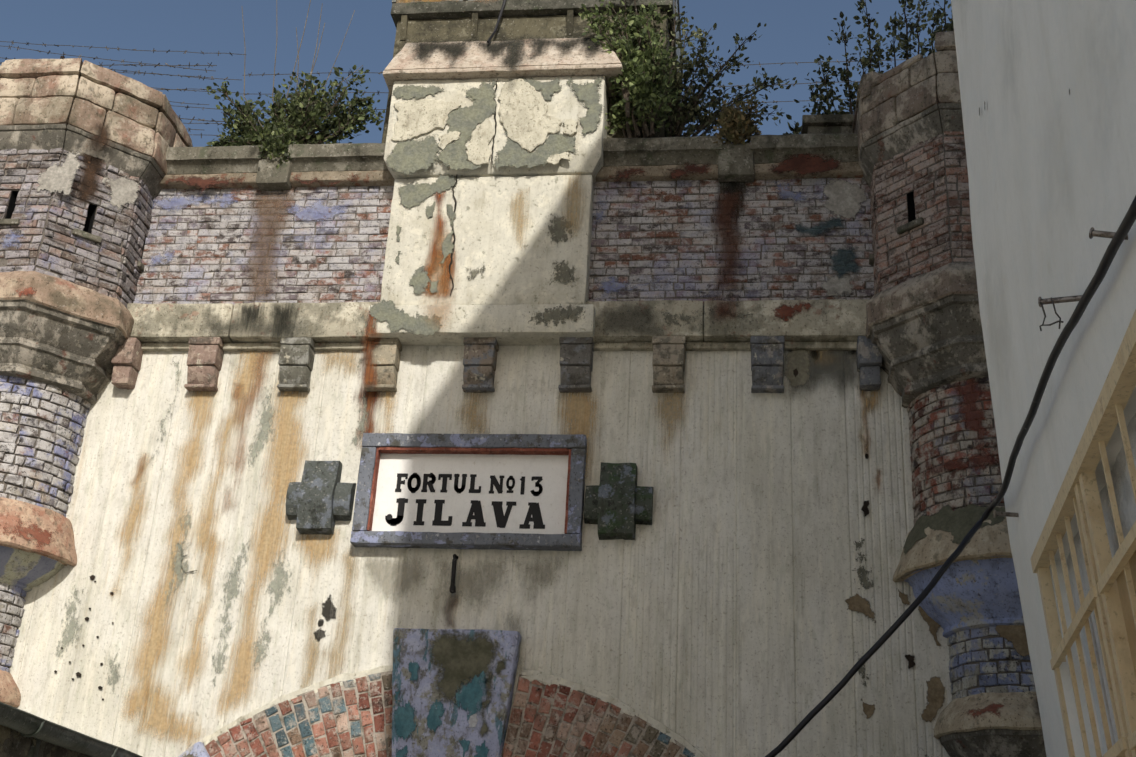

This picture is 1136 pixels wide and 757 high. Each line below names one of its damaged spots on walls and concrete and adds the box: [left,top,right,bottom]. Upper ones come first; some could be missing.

peeling [37,149,81,195]
peeling [102,176,139,210]
damp [217,194,301,337]
corrosion [357,311,392,446]
peeling [361,300,442,337]
peeling [409,266,439,295]
corrosion [424,193,455,296]
crack [449,174,458,296]
crack [490,79,498,167]
peeling [385,77,604,263]
damp [603,181,758,333]
peeling [394,630,507,757]